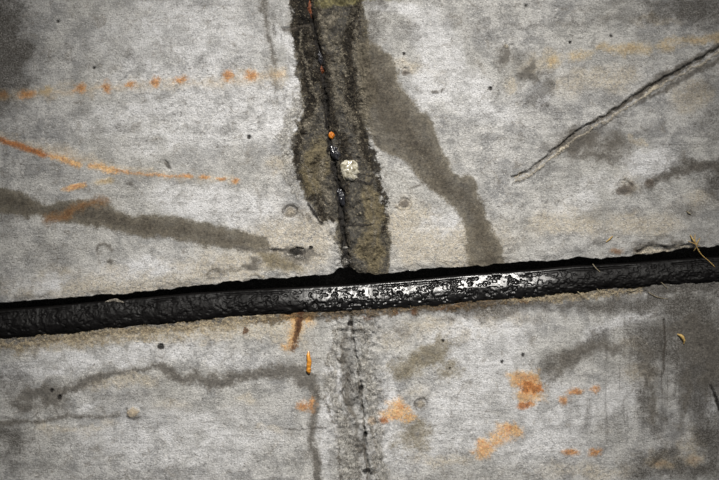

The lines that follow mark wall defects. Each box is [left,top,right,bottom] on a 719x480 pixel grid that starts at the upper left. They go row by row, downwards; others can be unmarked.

corrosion [0,137,79,166]
crack [283,0,374,268]
water stain [274,0,505,275]
crack [515,43,719,182]
water stain [0,188,276,253]
water stain [243,263,265,281]
corrosion [284,312,310,352]
corrosion [512,372,543,409]